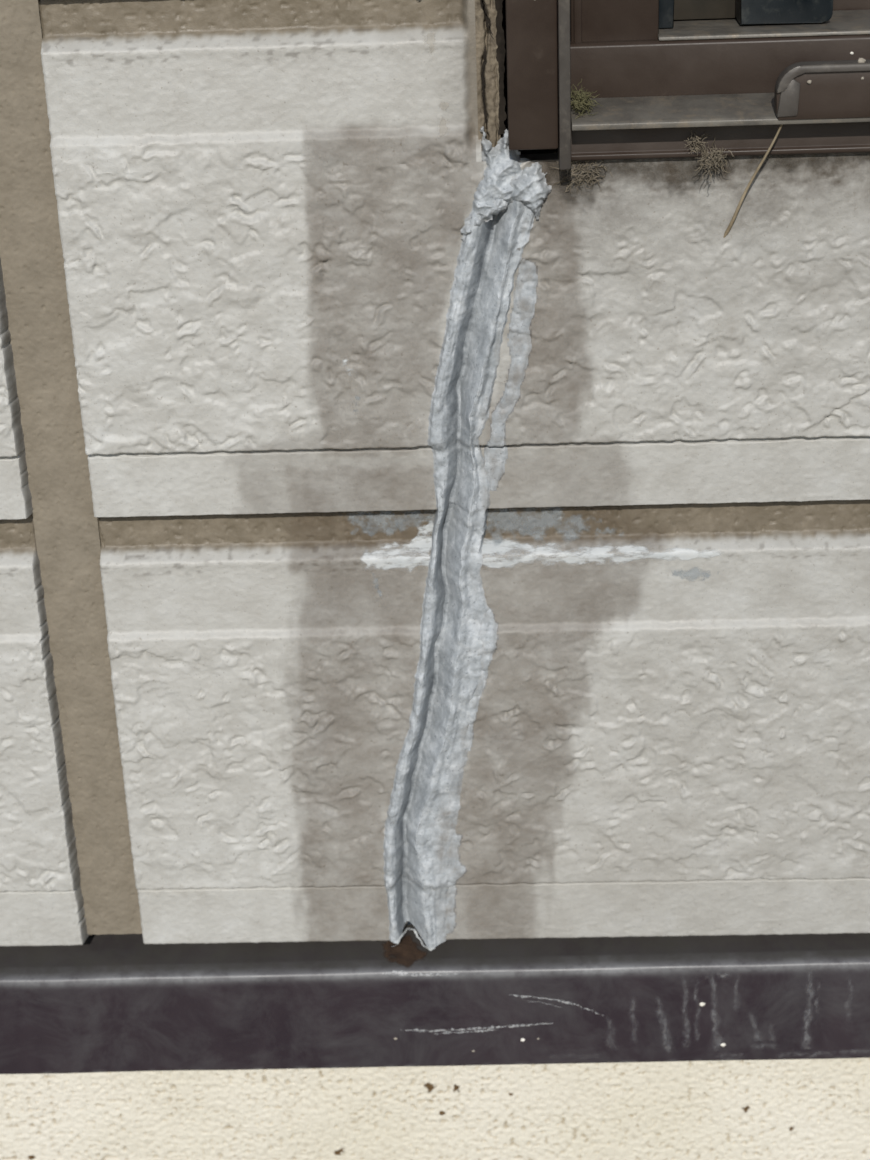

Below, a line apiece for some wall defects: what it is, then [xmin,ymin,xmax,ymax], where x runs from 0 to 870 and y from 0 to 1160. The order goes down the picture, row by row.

corrosion [383,935,426,967]
crack [383,0,552,951]